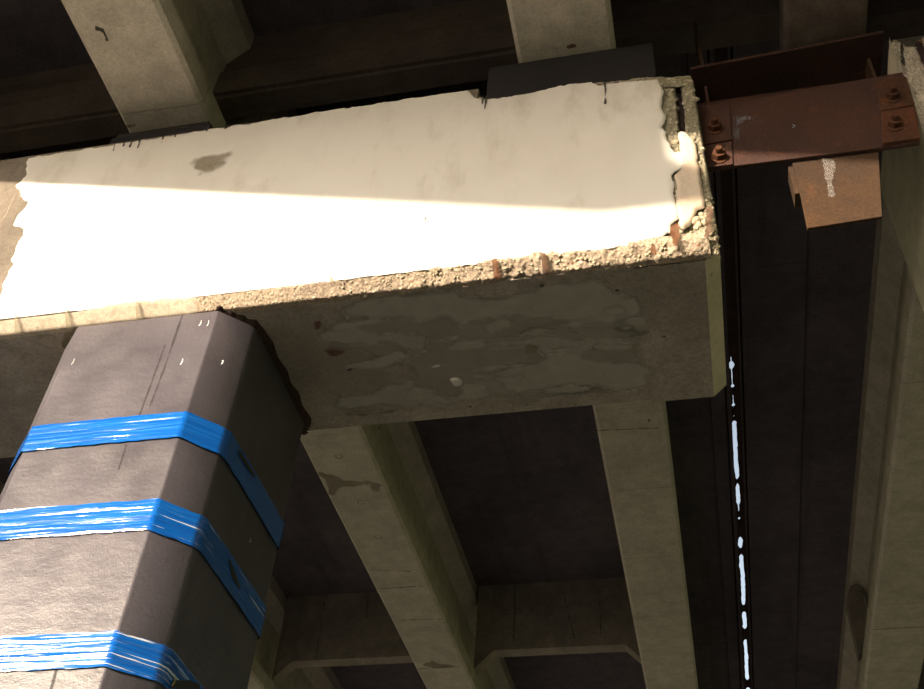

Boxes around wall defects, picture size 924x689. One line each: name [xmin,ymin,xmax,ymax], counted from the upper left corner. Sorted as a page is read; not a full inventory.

spalling [887,37,924,131]
water stain [195,153,229,171]
spalling [196,76,721,328]
corrosion [704,206,713,237]
corrosion [492,259,501,279]
corrosion [541,253,550,274]
water stain [319,473,381,495]